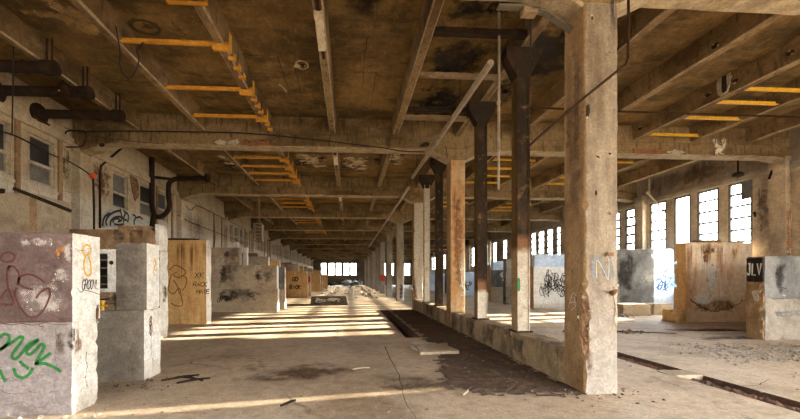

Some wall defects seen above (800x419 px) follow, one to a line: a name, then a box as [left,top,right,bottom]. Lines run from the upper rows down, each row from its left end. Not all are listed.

water stain [436,47,483,72]
peeling [22,288,59,311]
spalling [577,295,592,360]